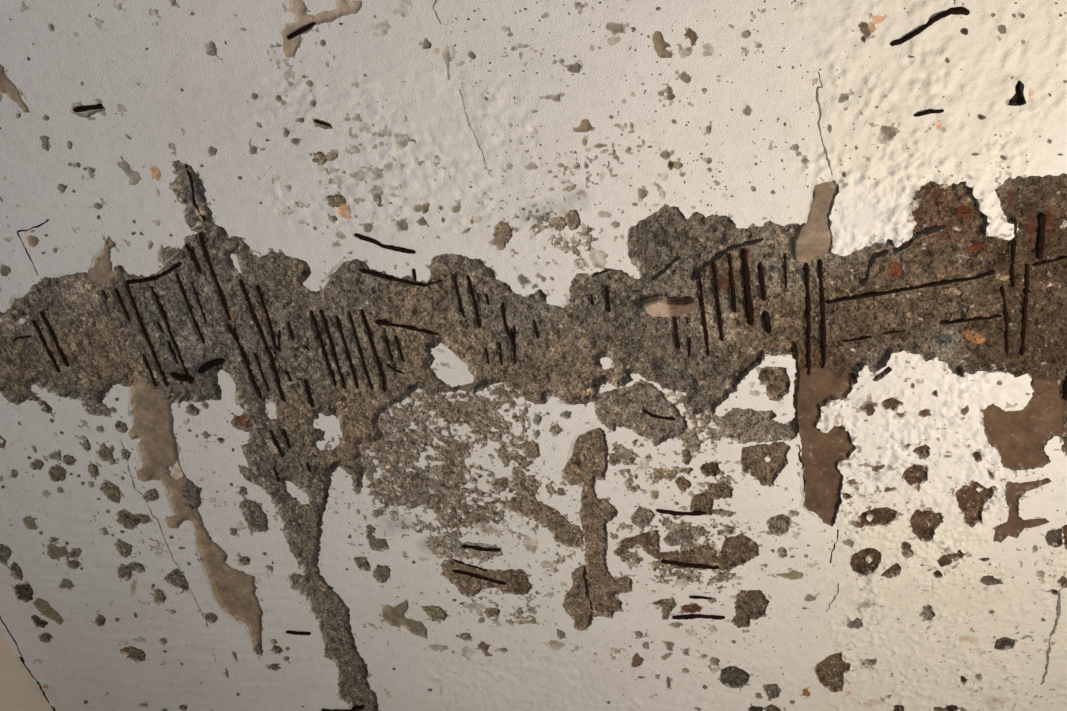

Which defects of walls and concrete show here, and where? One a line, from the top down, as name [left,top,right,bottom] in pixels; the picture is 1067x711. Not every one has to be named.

spalling [312,151,338,165]
peeling [561,119,632,192]
spalling [880,125,897,140]
spalling [0,160,1067,711]